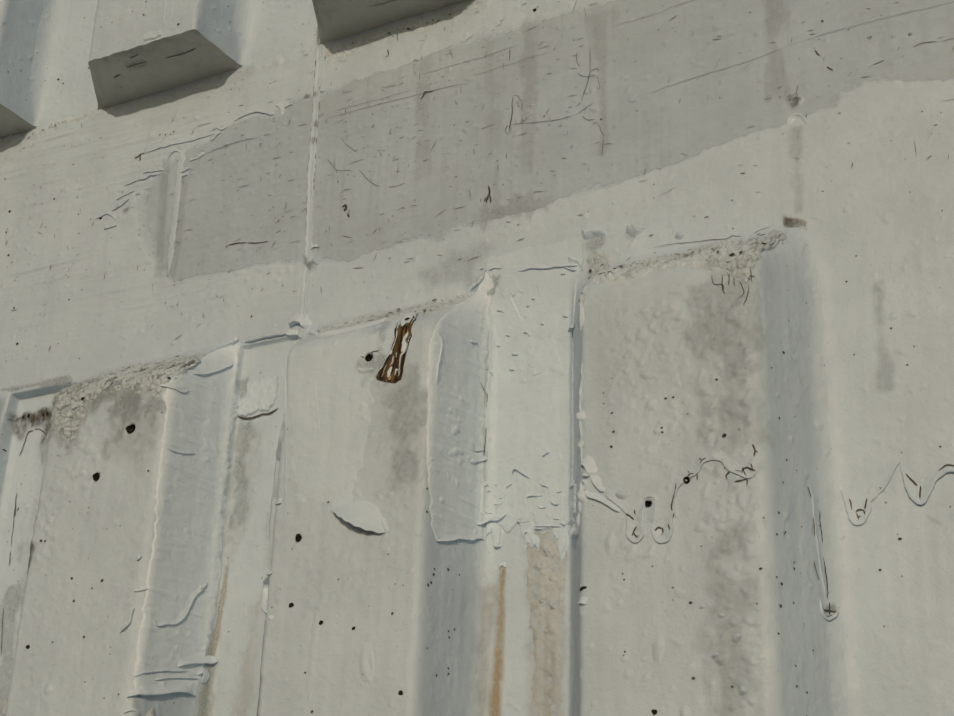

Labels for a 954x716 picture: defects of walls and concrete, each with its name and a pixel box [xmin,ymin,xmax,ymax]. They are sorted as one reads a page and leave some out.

peeling [42,217,807,716]